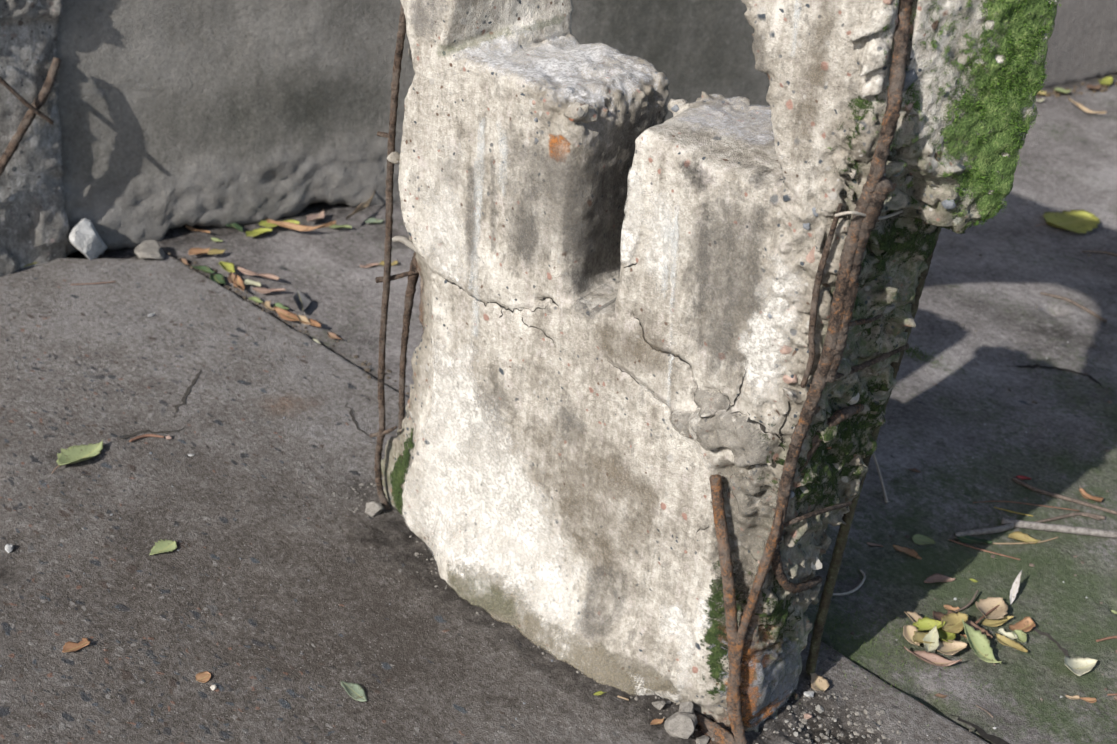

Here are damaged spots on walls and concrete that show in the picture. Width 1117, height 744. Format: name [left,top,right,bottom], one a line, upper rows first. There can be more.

crack [444,278,558,348]
damp [420,110,667,317]
rust [549,135,570,162]
damp [645,196,678,283]
damp [681,164,705,188]
crack [608,314,787,469]
damp [694,200,796,402]
spalling [635,0,941,744]
damp [408,329,677,696]
rust [719,644,789,728]